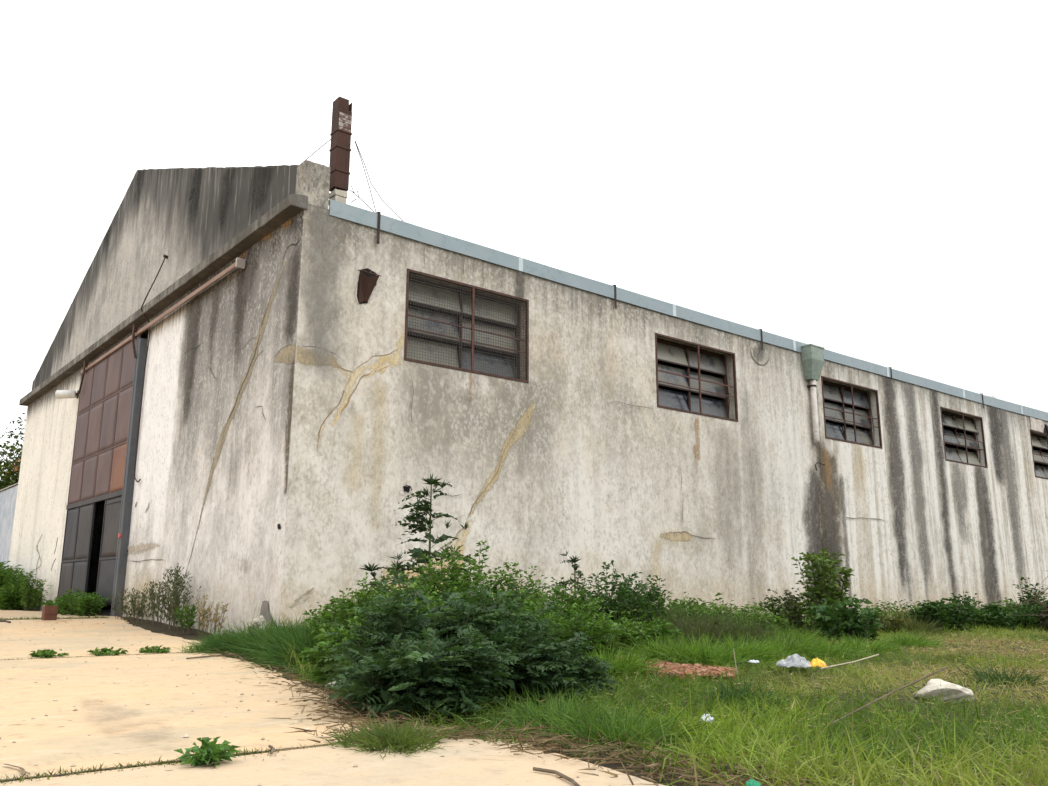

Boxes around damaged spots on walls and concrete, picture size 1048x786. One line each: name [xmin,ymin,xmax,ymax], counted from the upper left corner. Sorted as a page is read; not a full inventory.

damp [190,169,202,222]
damp [220,168,234,227]
damp [251,168,270,209]
damp [184,288,219,418]
damp [233,260,257,351]
damp [284,364,294,493]
crack [184,241,414,568]
crack [384,403,535,581]
damp [804,443,853,608]
damp [884,376,929,596]
damp [932,389,1025,606]